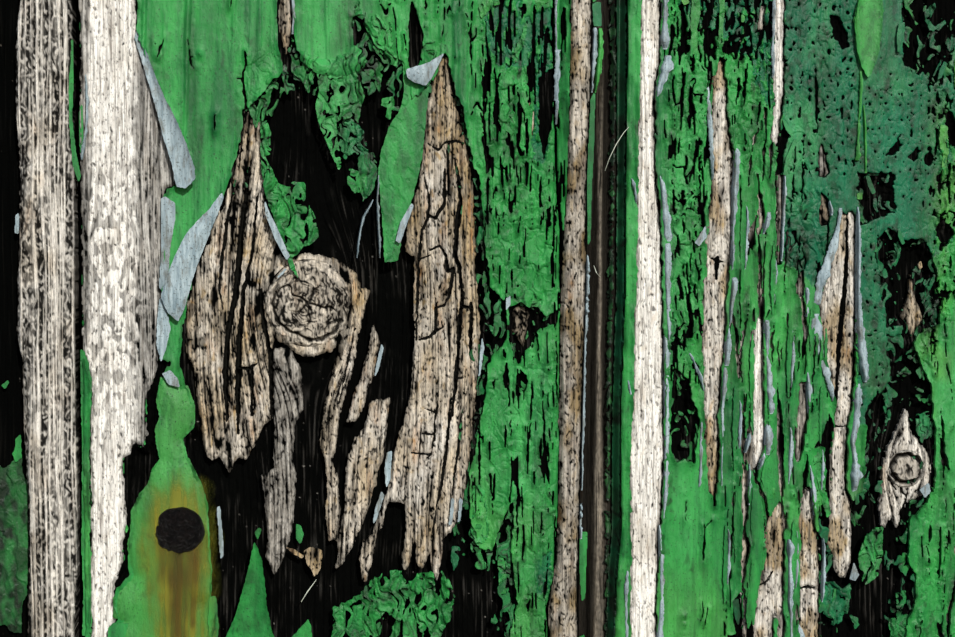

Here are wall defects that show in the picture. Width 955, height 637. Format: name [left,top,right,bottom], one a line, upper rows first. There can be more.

peeling [681,0,701,55]
peeling [924,2,946,32]
peeling [498,101,515,136]
peeling [908,125,949,177]
peeling [68,0,484,637]
crack [411,0,488,534]
peeling [534,0,674,637]
peeling [689,0,878,637]
peeling [899,275,922,337]
peeling [877,392,931,528]
corrosion [154,485,208,637]
peeling [895,590,906,616]